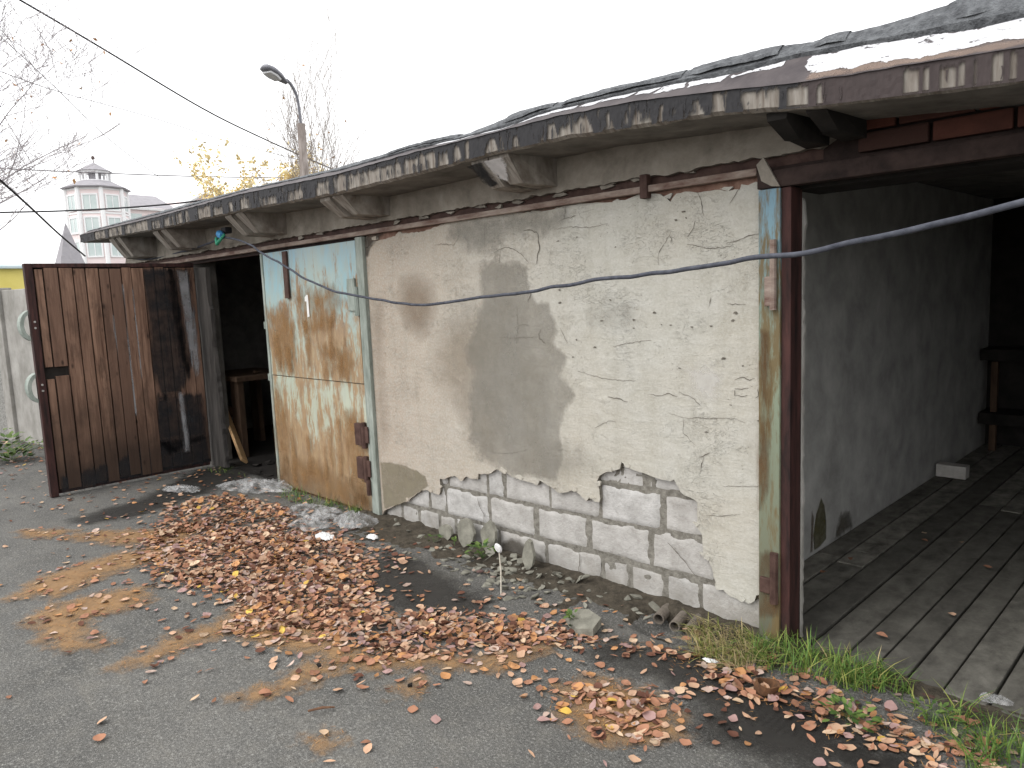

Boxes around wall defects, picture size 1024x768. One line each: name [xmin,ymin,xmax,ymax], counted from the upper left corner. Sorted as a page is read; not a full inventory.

peeling [805,18,1024,79]
peeling [436,61,785,145]
flaking render [143,149,823,263]
crack [439,207,605,261]
crack [658,194,755,265]
rust [271,290,335,371]
leakage [470,266,565,477]
crack [653,377,759,467]
rust [759,434,767,491]
flaking render [386,463,759,628]